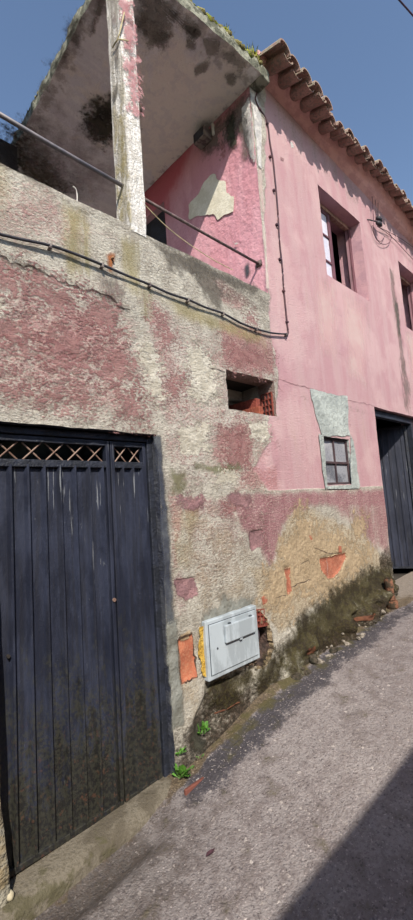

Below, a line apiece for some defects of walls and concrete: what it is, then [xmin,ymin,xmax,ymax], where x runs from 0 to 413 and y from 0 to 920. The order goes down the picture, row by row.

flaking render [118,0,247,117]
damp [79,83,117,152]
damp [203,93,253,161]
spalling [242,87,262,169]
flaking render [188,174,234,220]
peeling [0,251,279,519]
peeling [310,388,360,489]
damp [390,270,410,407]
flaking render [177,498,377,714]
damp [258,563,397,693]